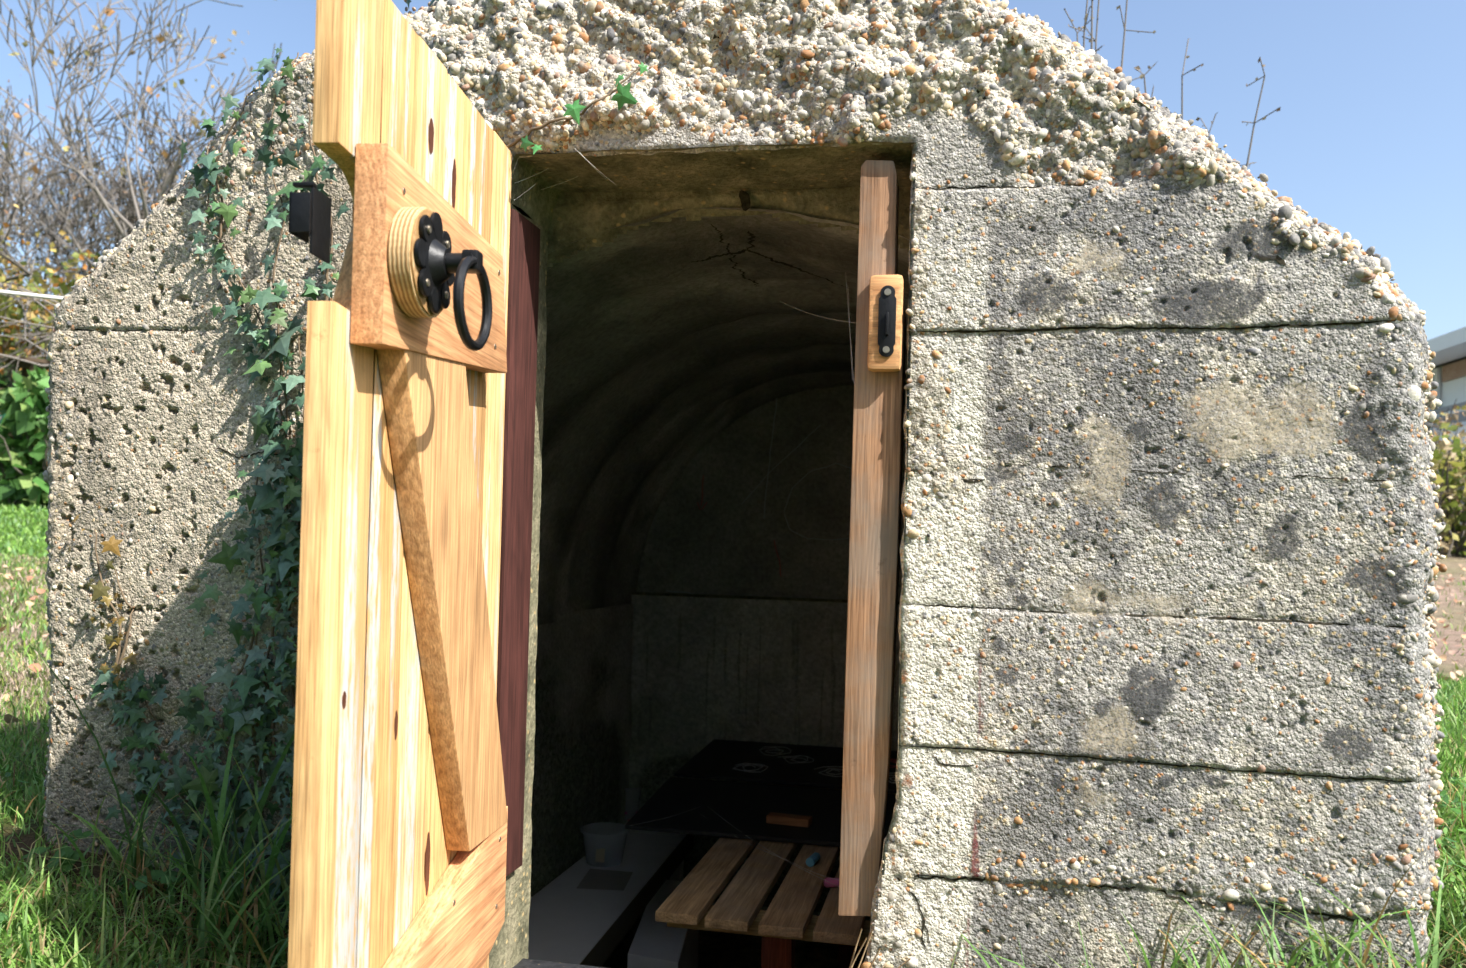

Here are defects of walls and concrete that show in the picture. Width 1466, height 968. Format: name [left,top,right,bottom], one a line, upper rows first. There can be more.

crack [692,223,848,288]
leakage [1218,219,1294,258]
leakage [1017,272,1072,313]
leakage [1154,280,1265,324]
leakage [1266,514,1300,560]
leakage [1007,561,1029,606]
leakage [1338,557,1427,597]
leakage [993,636,1017,685]
leakage [1094,666,1178,719]
crack [894,875,1001,951]
crack [1088,884,1215,906]
crack [1253,904,1374,922]